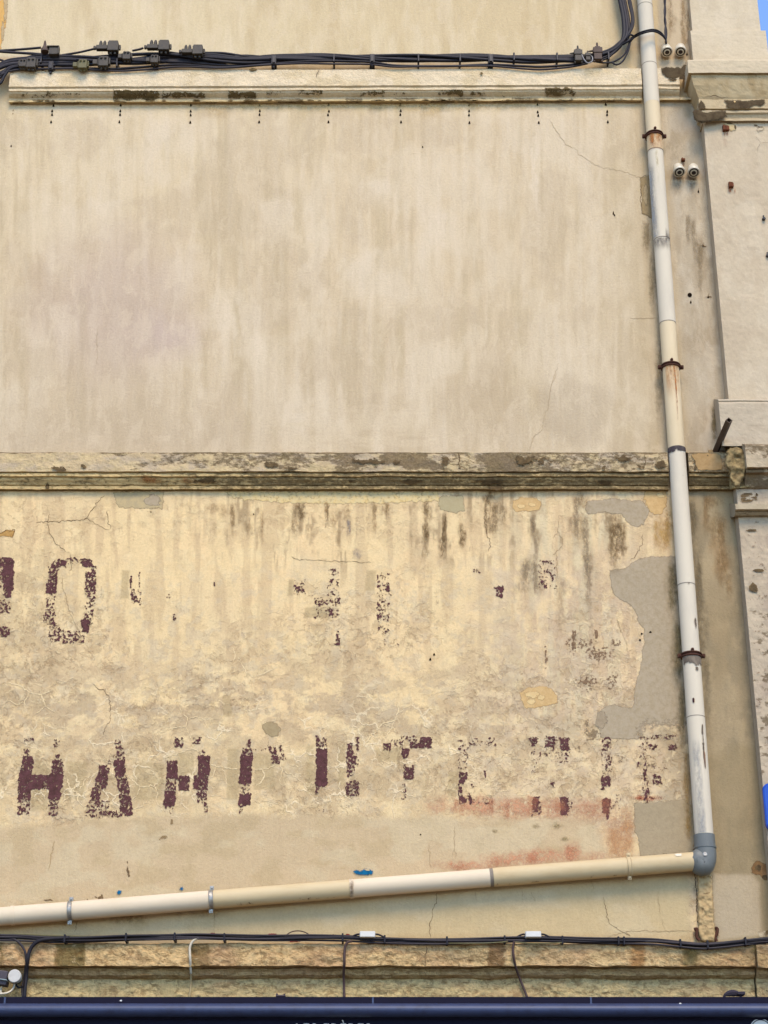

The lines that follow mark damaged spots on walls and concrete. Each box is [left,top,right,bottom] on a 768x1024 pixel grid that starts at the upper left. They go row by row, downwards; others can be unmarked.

flaking render [692,99,765,131]
crack [46,496,111,635]
crack [165,707,301,806]
crack [63,774,164,813]
crack [603,875,710,937]